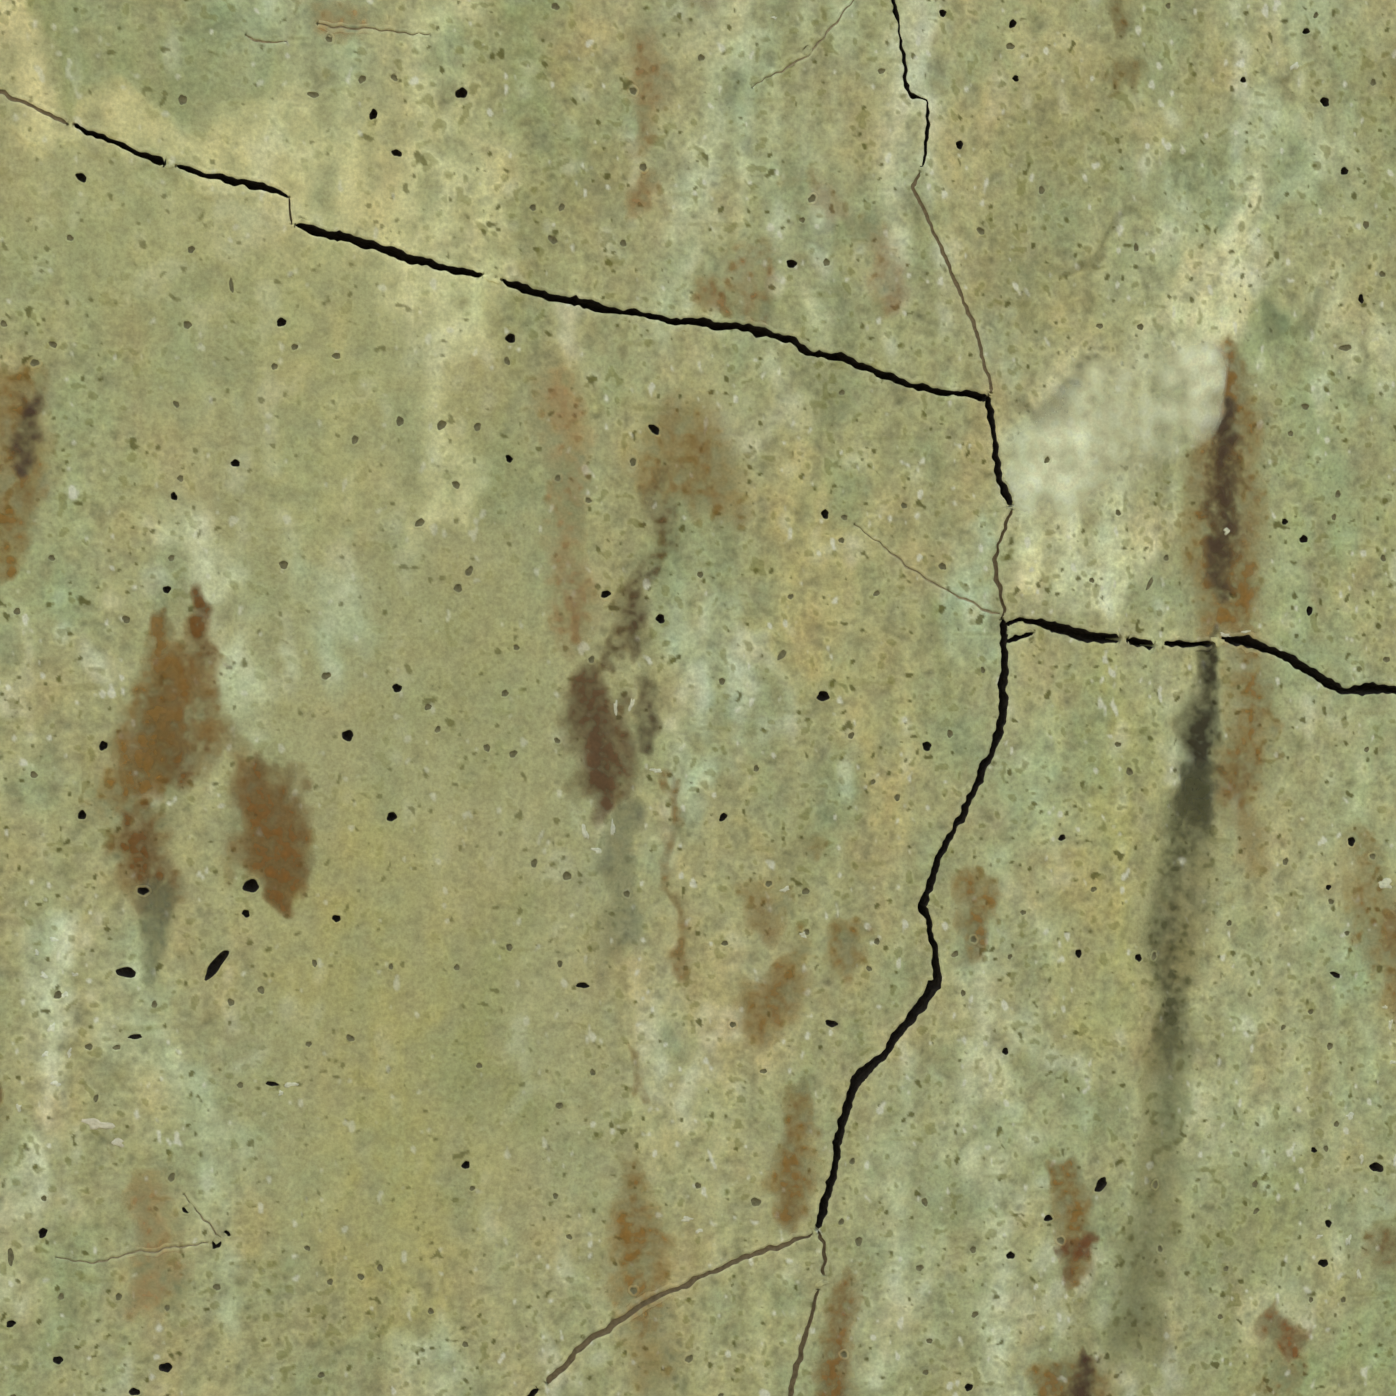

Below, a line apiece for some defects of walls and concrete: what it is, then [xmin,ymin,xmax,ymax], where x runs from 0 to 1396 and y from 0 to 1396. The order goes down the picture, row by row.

crack [244,19,430,48]
crack [0,84,484,284]
corrosion [0,367,42,578]
corrosion [645,412,722,514]
corrosion [1188,339,1265,635]
corrosion [105,587,222,910]
corrosion [233,758,310,915]
corrosion [567,574,660,820]
crack [501,0,1396,1396]
leakage [1149,630,1251,1072]
corrosion [1357,886,1396,950]
crack [56,1192,228,1269]